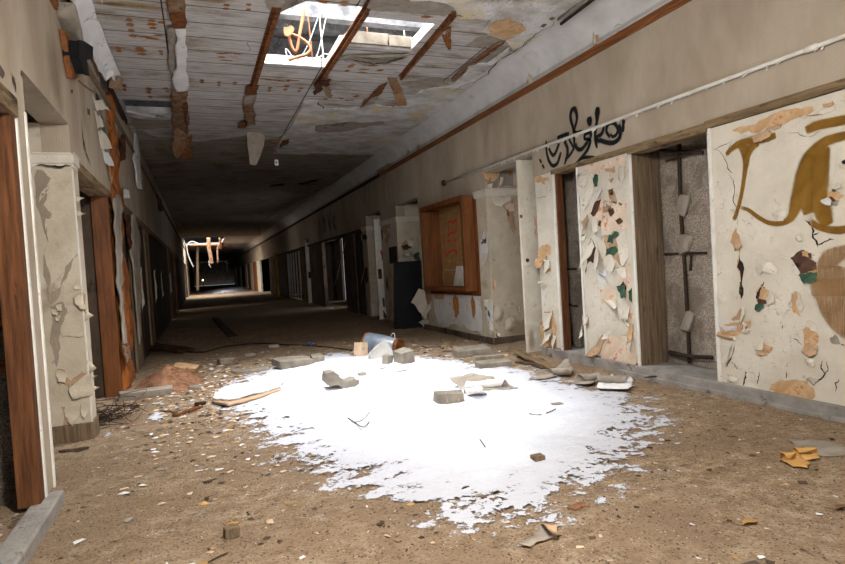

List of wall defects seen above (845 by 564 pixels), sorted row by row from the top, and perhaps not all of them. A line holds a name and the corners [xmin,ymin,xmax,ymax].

flaking render [264,0,308,13]
flaking render [367,0,454,17]
flaking render [341,53,410,66]
flaking render [479,18,527,63]
flaking render [315,121,384,133]
peeling [482,158,517,235]
peeling [34,169,99,426]
peeling [535,244,551,284]
peeling [577,156,637,365]
peeling [716,228,775,340]
peeling [777,250,819,357]
peeling [769,376,819,399]